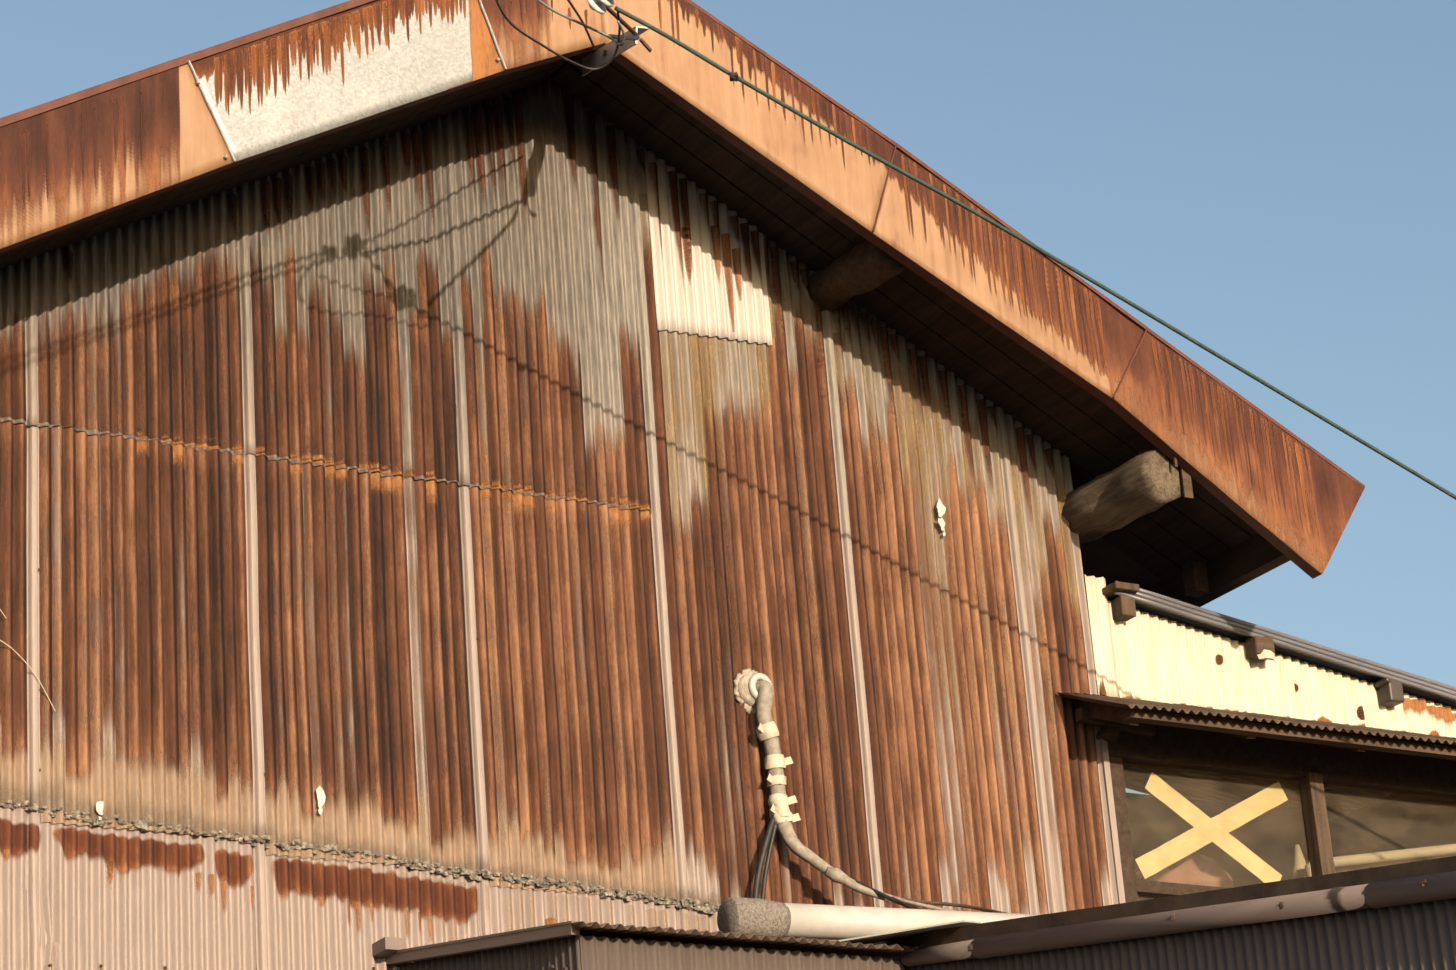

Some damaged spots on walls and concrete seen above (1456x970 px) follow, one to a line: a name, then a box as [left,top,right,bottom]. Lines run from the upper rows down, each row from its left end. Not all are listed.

rust [0,0,588,240]
rust [0,125,1133,936]
rust [563,95,619,276]
rust [658,0,1365,574]